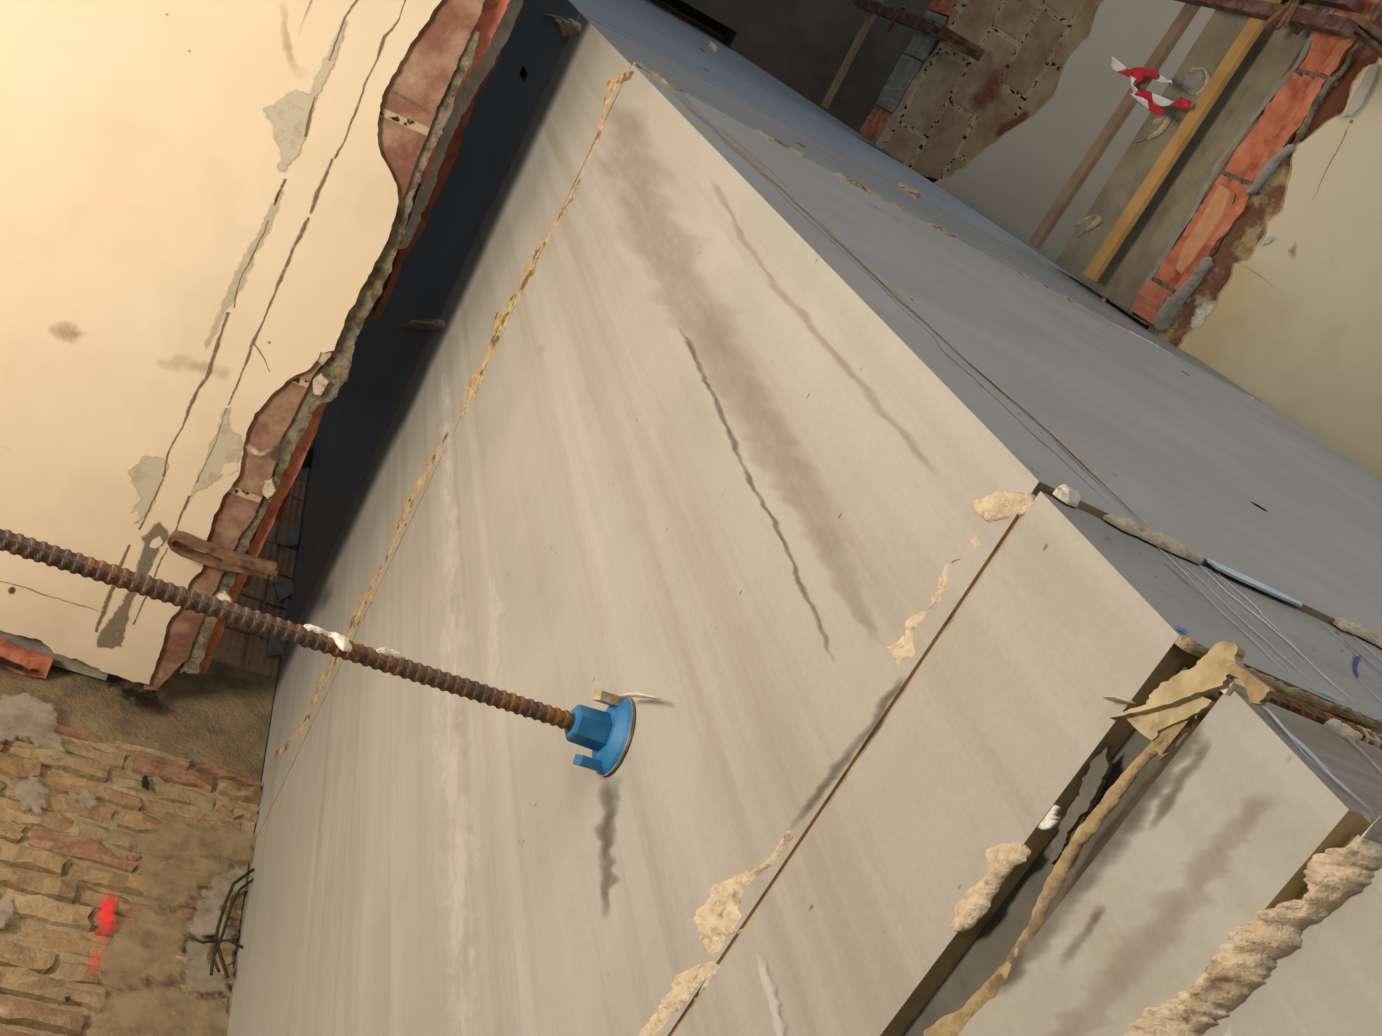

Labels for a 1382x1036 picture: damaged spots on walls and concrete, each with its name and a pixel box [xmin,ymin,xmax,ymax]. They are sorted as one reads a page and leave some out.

crack [0,0,406,632]
spalling [188,0,526,604]
spalling [1129,0,1382,347]
spalling [0,656,38,673]
spalling [108,607,226,709]
damp [1174,562,1297,659]